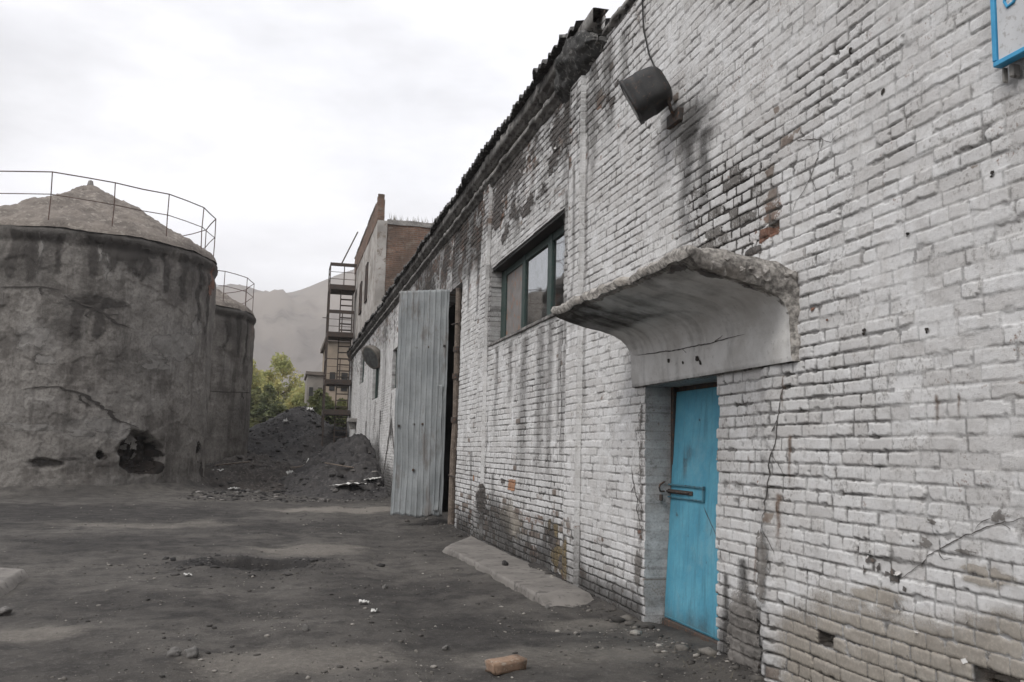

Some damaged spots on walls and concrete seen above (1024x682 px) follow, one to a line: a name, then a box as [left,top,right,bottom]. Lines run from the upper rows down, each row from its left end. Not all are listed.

water stain [681,127,708,200]
peeling [686,153,781,256]
water stain [4,231,66,281]
water stain [80,233,211,335]
spalling [667,265,723,279]
water stain [63,295,127,340]
crack [641,334,743,355]
crack [22,386,138,428]
spalling [0,417,165,474]
crack [761,378,783,552]
peeling [473,475,521,538]
crack [894,518,1020,583]